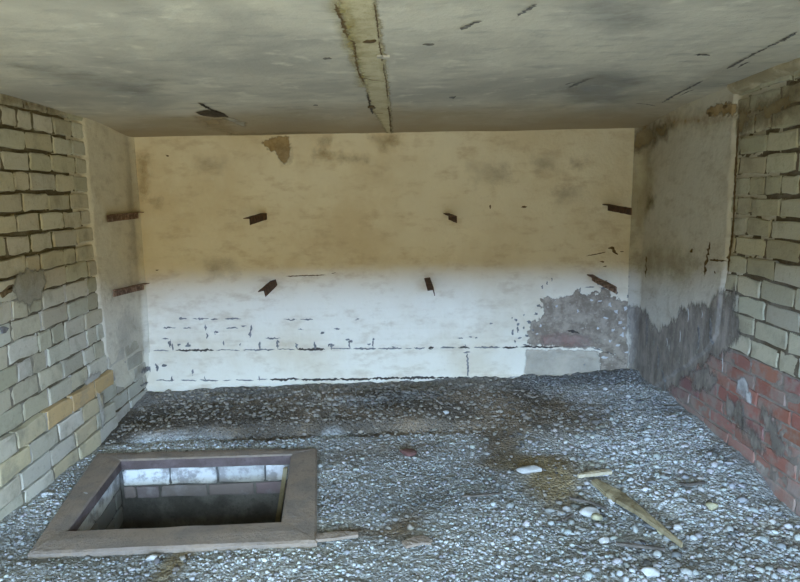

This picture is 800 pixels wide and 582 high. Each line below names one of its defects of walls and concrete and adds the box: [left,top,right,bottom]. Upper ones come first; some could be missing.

spalling [196,103,245,126]
peeling [262,136,290,163]
crack [333,4,392,133]
peeling [511,278,629,376]
leakage [599,287,739,391]